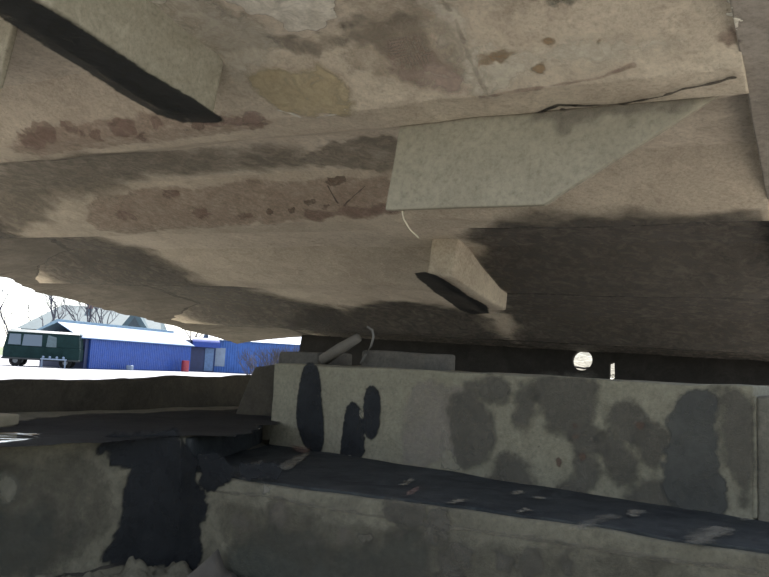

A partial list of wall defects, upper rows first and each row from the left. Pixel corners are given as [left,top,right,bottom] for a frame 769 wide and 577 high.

peeling [225,0,337,32]
damp [338,0,496,96]
crack [538,76,737,113]
damp [0,148,298,239]
damp [310,137,397,171]
damp [37,212,769,515]
damp [0,409,282,577]